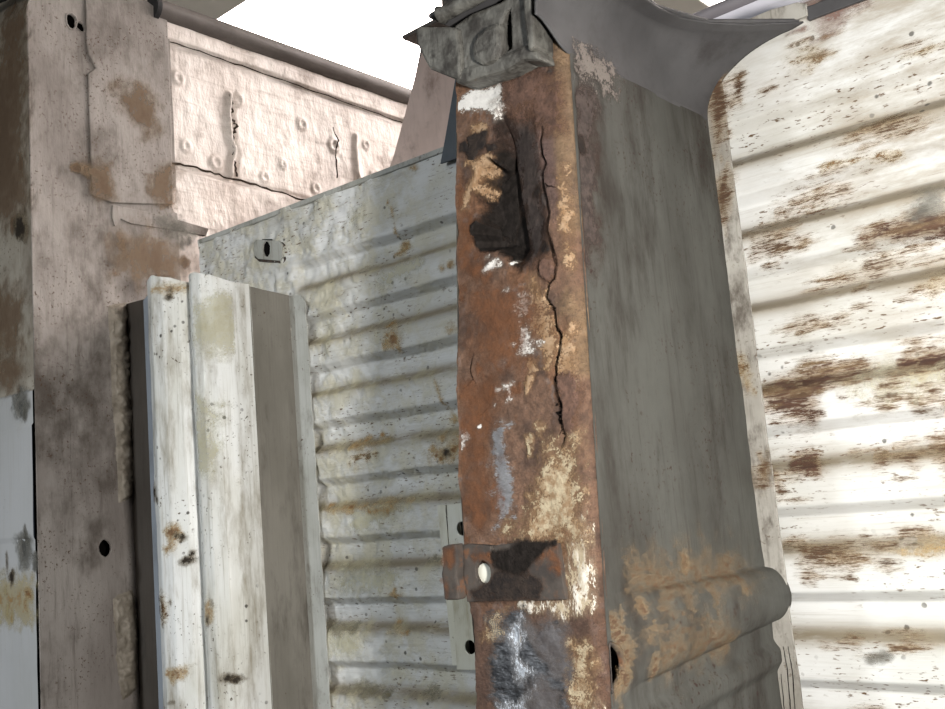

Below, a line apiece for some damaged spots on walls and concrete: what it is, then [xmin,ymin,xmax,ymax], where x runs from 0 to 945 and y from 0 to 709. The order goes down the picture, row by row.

damp [0,1,32,235]
damp [110,81,161,138]
corrosion [749,112,928,269]
corrosion [804,205,945,294]
crack [532,238,566,448]
corrosion [782,303,878,338]
corrosion [738,337,945,501]
corrosion [163,523,186,553]
corrosion [784,525,935,588]